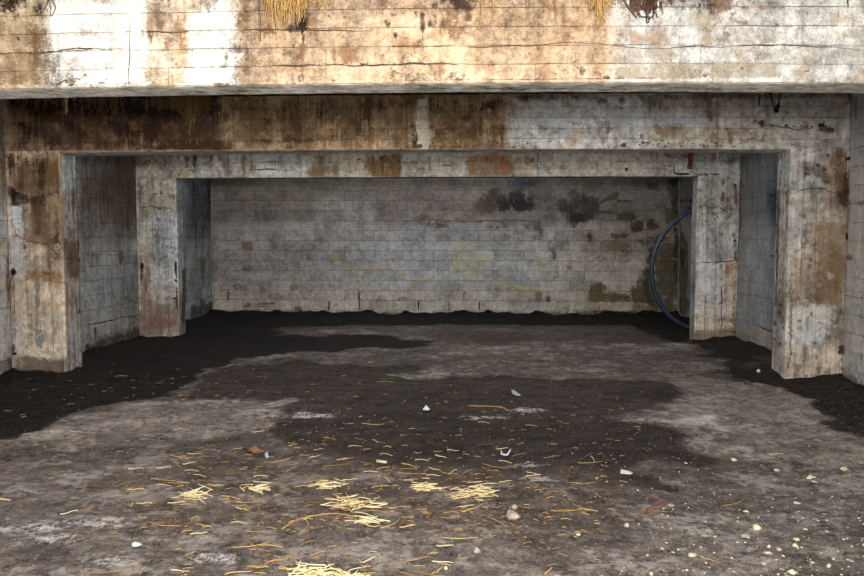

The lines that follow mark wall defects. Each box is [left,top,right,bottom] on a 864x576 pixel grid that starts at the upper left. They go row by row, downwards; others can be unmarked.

leakage [25,222,79,321]
leakage [0,96,418,241]
leakage [425,96,516,165]
leakage [475,178,540,214]
leakage [512,178,692,316]
leakage [803,147,852,304]